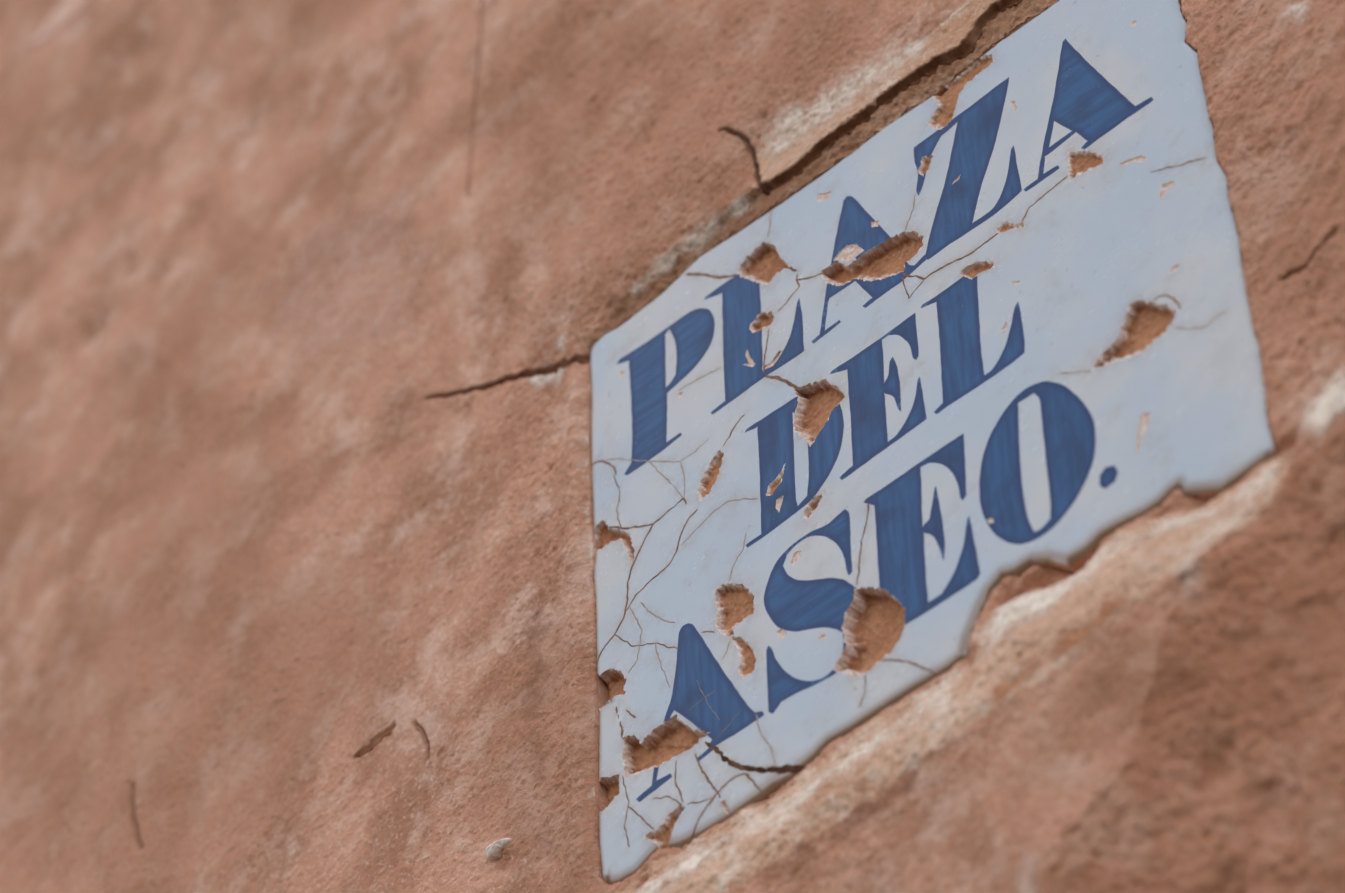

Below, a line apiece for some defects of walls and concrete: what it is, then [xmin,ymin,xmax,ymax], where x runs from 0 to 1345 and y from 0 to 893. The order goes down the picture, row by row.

spalling [582,0,1058,350]
crack [719,0,1023,238]
crack [902,175,1068,299]
crack [427,356,591,399]
crack [763,267,822,390]
spalling [1091,298,1176,370]
crack [1154,295,1225,330]
crack [592,414,805,847]
spalling [714,582,757,679]
spalling [834,586,906,678]
spalling [1037,429,1345,893]
spalling [599,714,710,812]